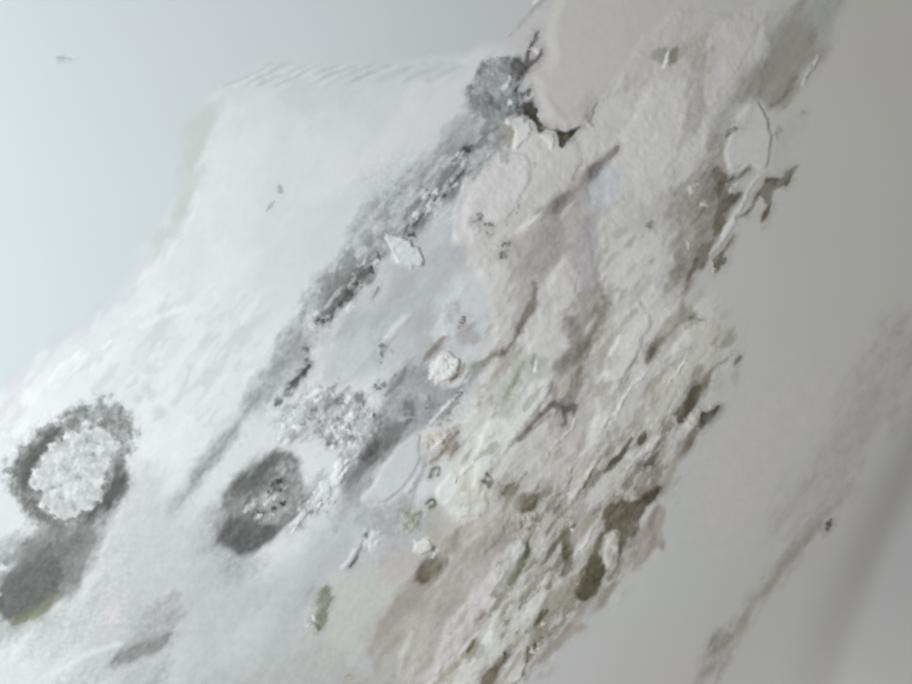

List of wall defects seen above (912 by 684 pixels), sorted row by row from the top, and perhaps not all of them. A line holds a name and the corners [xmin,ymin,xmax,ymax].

peeling [0,38,508,485]
leakage [0,51,542,684]
flaking render [205,335,400,537]
peeling [414,0,778,684]
leakage [326,296,912,684]
leakage [465,0,853,458]